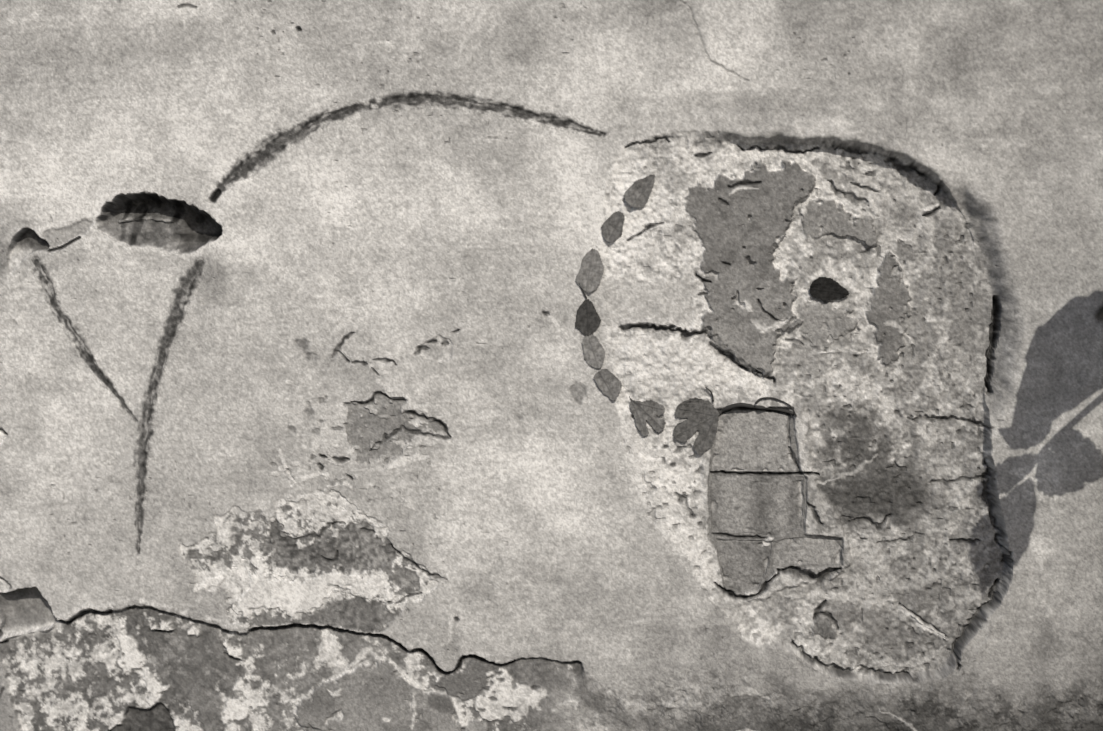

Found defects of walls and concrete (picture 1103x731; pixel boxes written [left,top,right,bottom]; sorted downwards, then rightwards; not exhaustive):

crack [678,0,752,84]
spalling [8,191,225,277]
flaking render [413,327,462,363]
flaking render [0,427,11,448]
flaking render [287,402,315,436]
flaking render [293,331,454,484]
flaking render [568,382,589,406]
flaking render [596,129,1017,688]
flaking render [0,448,609,731]